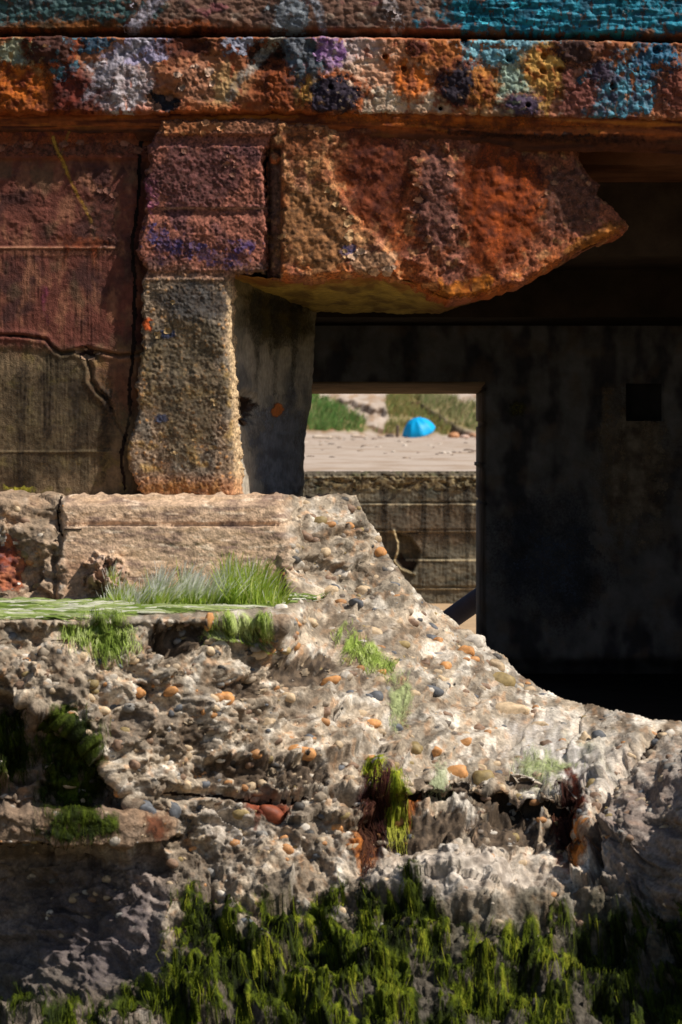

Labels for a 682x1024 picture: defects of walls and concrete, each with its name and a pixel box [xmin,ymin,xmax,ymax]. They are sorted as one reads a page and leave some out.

corrosion [4,17,246,64]
corrosion [0,60,112,115]
corrosion [256,60,319,119]
corrosion [322,40,644,299]
crack [54,495,82,542]
spalling [0,533,27,592]
crack [163,791,313,806]
crack [402,790,459,802]